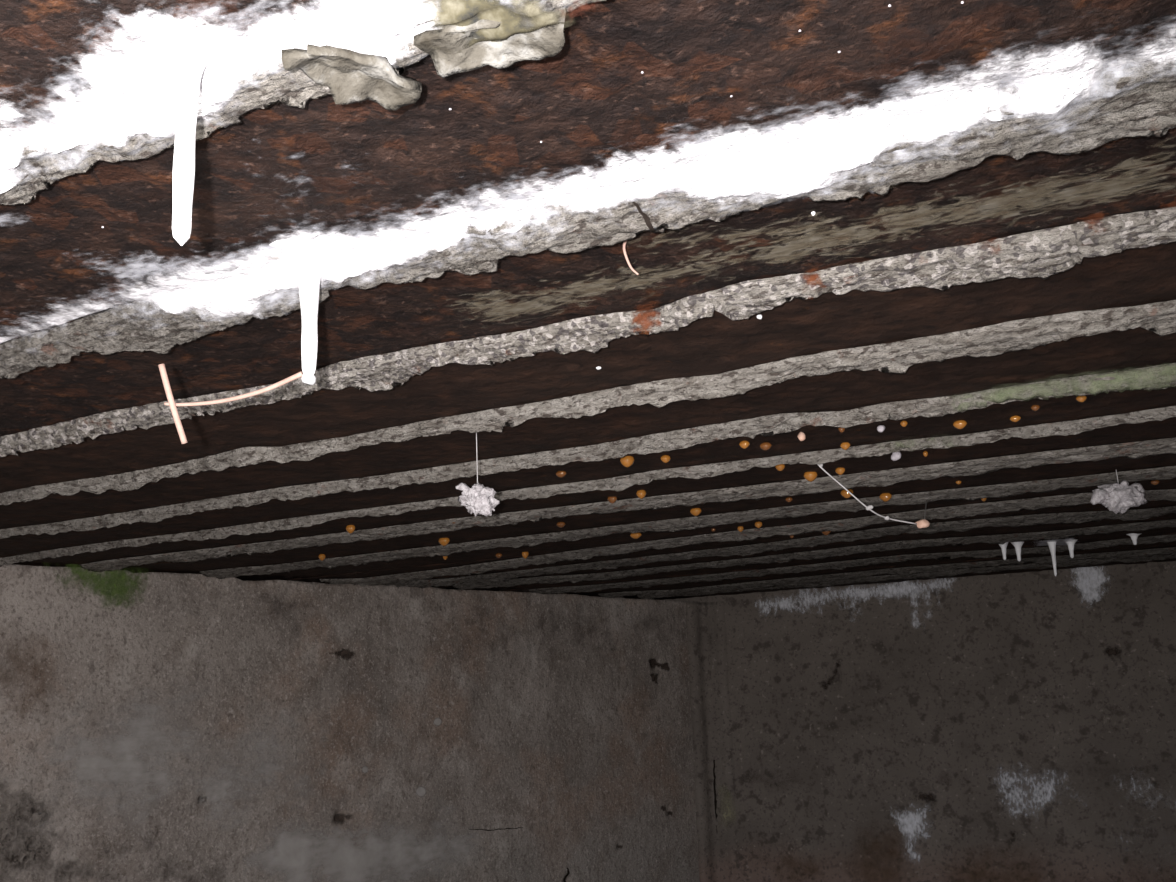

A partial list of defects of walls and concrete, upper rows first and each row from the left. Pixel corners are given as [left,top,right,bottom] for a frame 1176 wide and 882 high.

damp [0,0,591,246]
damp [0,40,1176,385]
peeling [455,139,1176,324]
rust [632,301,661,334]
damp [755,579,954,627]
damp [1072,567,1109,602]
damp [1000,765,1065,813]
damp [894,804,928,859]